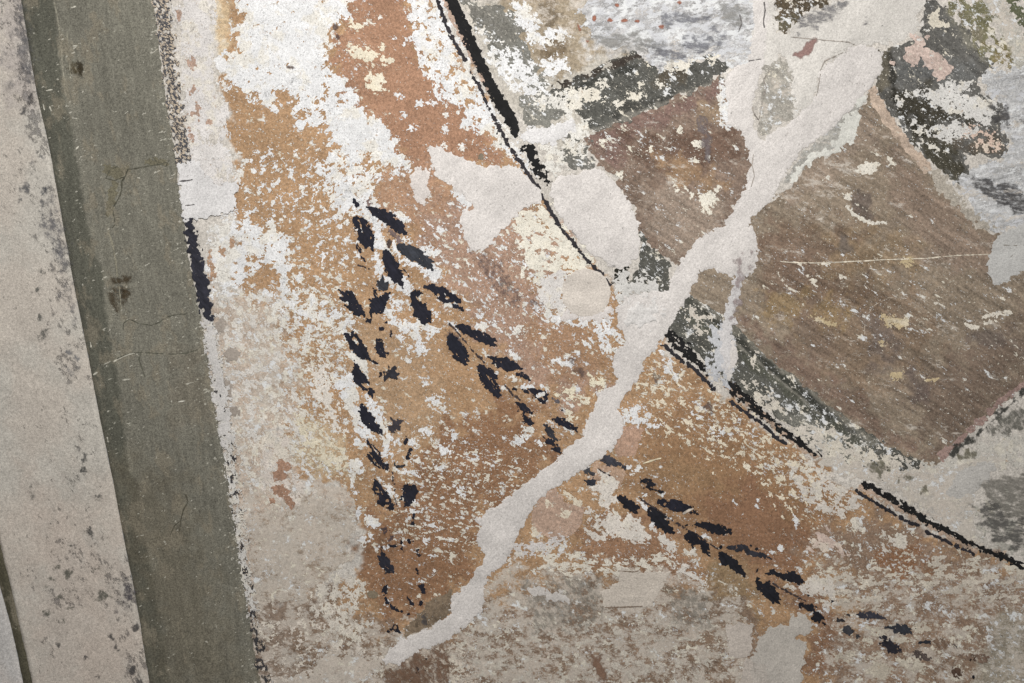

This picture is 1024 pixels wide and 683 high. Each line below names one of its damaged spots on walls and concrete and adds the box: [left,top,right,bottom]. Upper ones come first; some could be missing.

peeling [919,7,950,33]
peeling [757,57,799,135]
peeling [779,104,863,184]
peeling [855,154,897,175]
peeling [894,55,1009,163]
peeling [842,192,887,225]
peeling [171,0,757,683]
crack [381,0,884,666]
peeling [806,313,837,327]
peeling [880,313,909,330]
peeling [620,344,1024,621]
peeling [831,621,932,681]